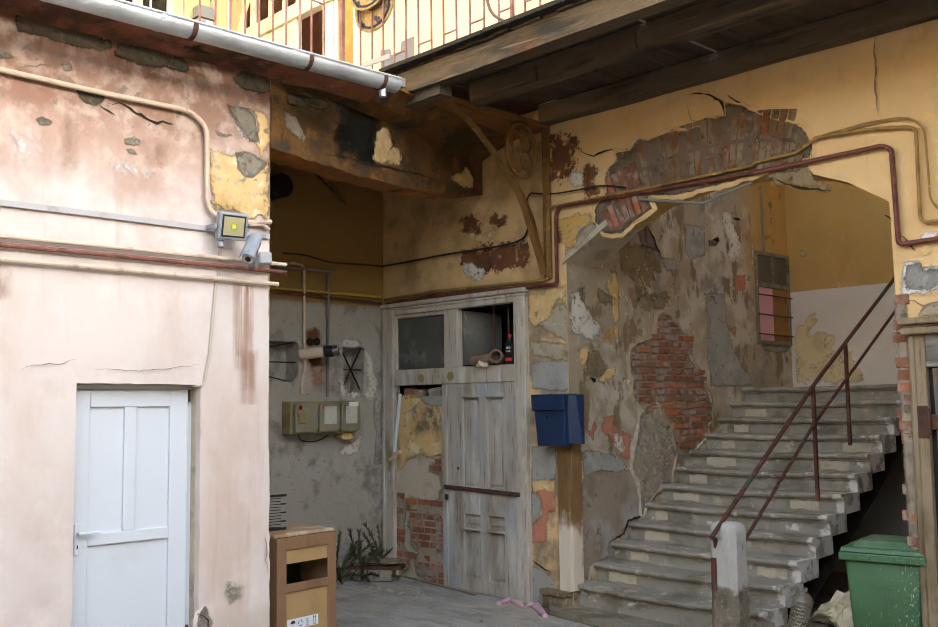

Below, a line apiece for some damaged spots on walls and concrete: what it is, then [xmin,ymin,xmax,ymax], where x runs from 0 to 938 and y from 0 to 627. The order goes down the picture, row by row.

spalling [15,15,189,73]
crack [99,102,173,125]
peeling [210,105,271,220]
peeling [372,126,402,166]
peeling [459,212,530,282]
spalling [528,285,616,383]
spalling [550,100,832,520]
peeling [794,312,863,385]
spalling [892,232,938,551]
spalling [396,392,444,585]
peeling [532,479,556,543]
spalling [193,604,214,627]